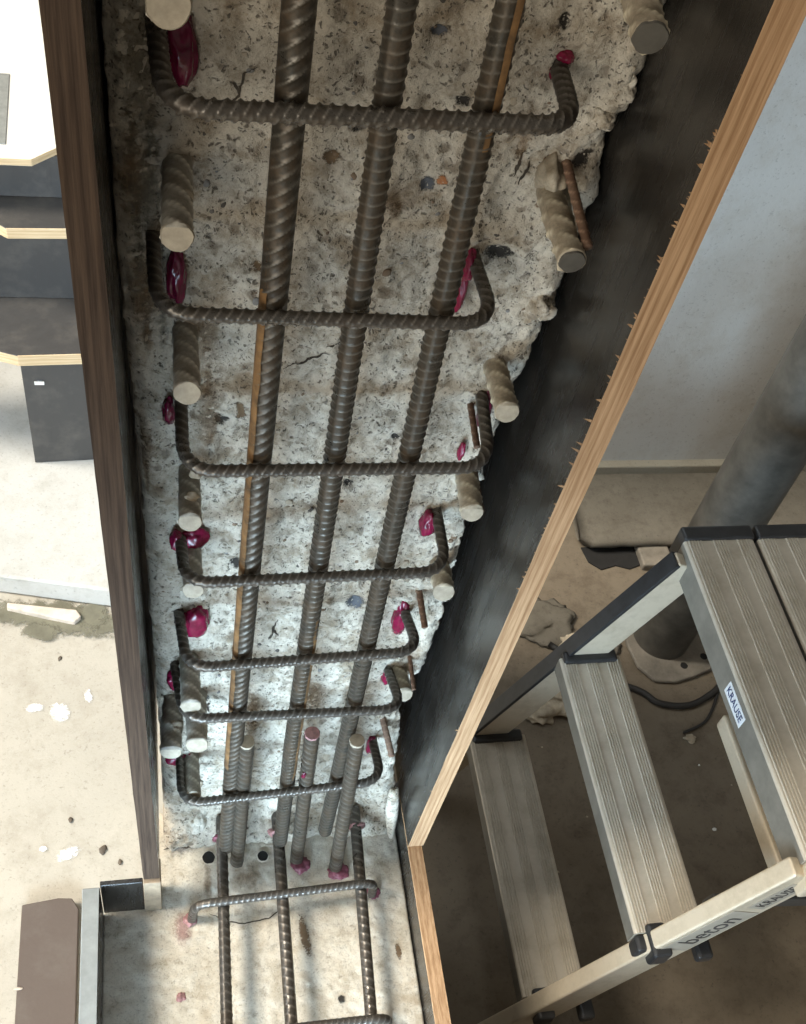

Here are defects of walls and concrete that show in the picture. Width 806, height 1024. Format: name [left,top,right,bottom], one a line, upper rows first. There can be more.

crack [232,67,257,100]
spalling [240,123,306,311]
spalling [271,0,318,104]
spalling [343,126,415,313]
spalling [365,0,419,108]
spalling [419,131,522,316]
spalling [456,0,526,113]
spalling [572,149,593,167]
crack [283,342,340,369]
spalling [206,324,286,1024]
spalling [258,327,367,1024]
spalling [318,329,450,839]